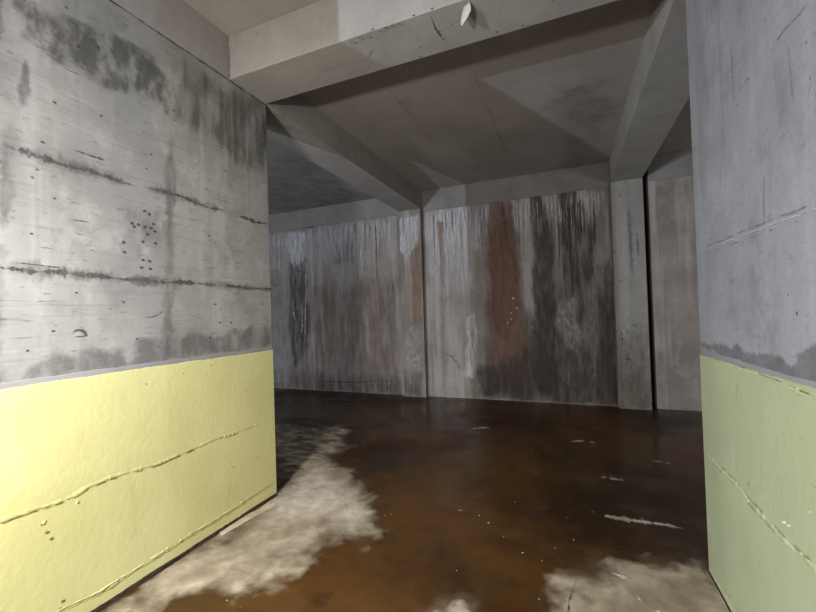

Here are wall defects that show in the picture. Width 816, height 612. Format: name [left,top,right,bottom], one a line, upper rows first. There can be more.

water stain [51,20,162,101]
water stain [388,215,418,256]
water stain [426,206,492,252]
crack [695,208,816,254]
water stain [289,230,331,365]
corrosion [487,202,531,392]
water stain [465,191,652,409]
water stain [706,345,816,382]
water stain [150,425,371,596]
water stain [606,515,675,527]
water stain [449,602,467,612]
water stain [553,565,729,612]